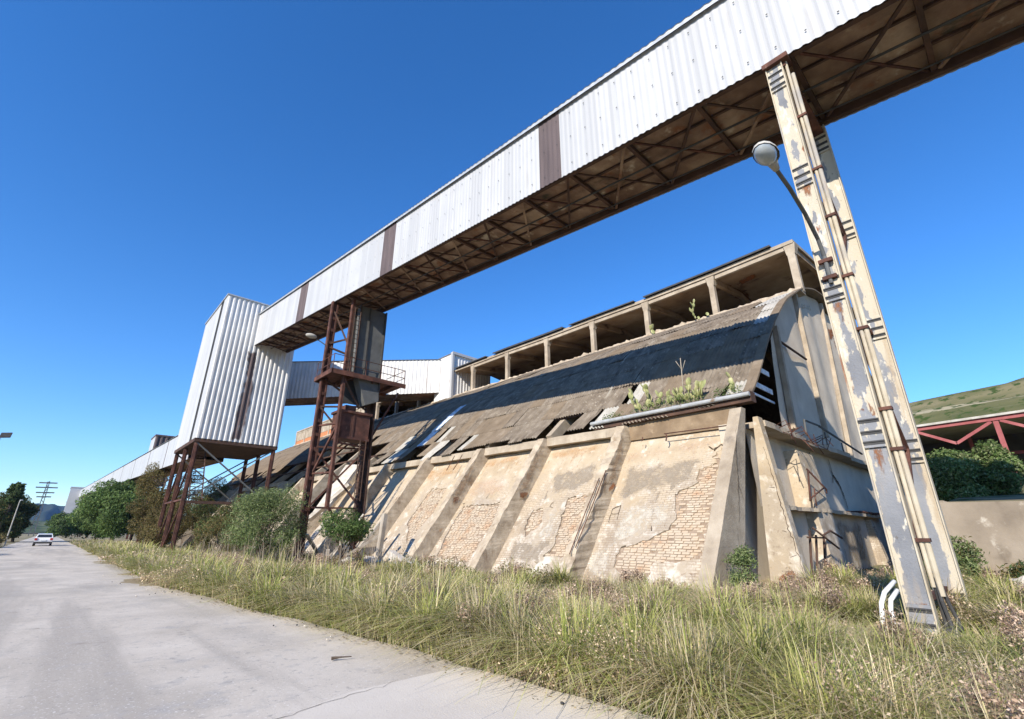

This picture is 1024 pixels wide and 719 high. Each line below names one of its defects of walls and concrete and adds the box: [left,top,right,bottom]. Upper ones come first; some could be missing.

spalling [401,482,452,548]
spalling [434,497,506,570]
spalling [517,470,606,569]
spalling [604,448,722,589]